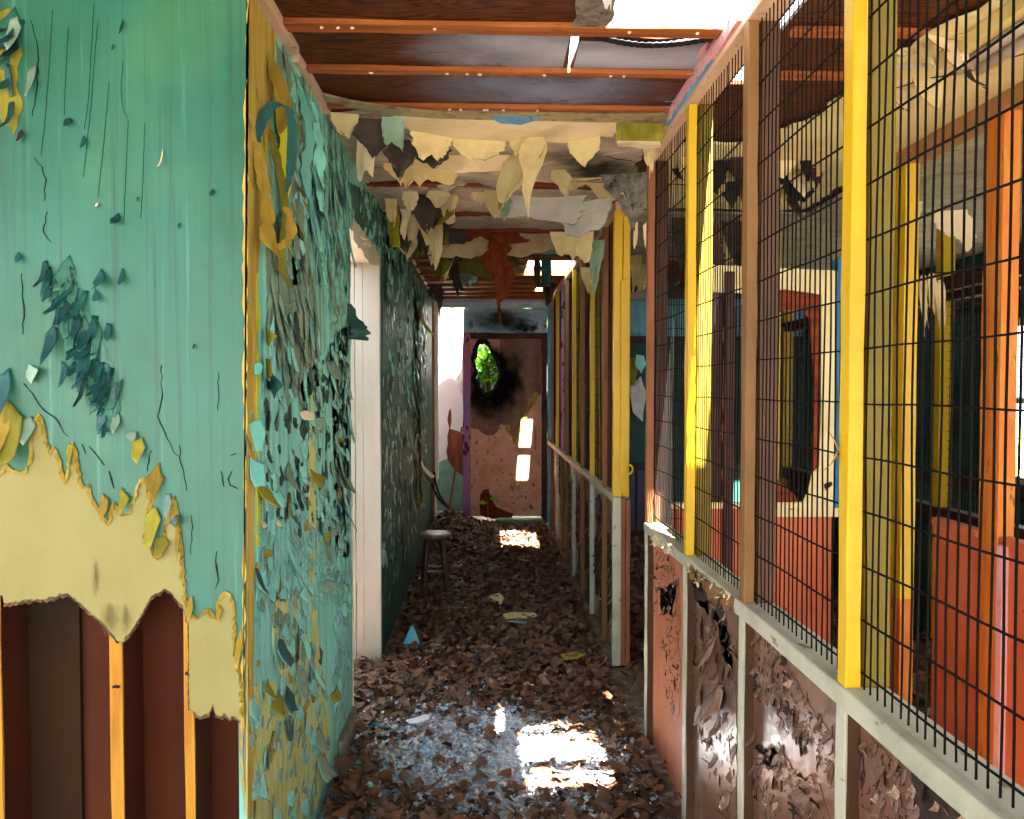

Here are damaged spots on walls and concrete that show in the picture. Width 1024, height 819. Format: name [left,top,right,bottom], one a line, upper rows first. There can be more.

crack [30,4,145,240]
crack [147,365,187,491]
peeling [0,0,458,819]
leakage [480,311,535,332]
peeling [644,533,835,819]
peeling [858,741,965,819]